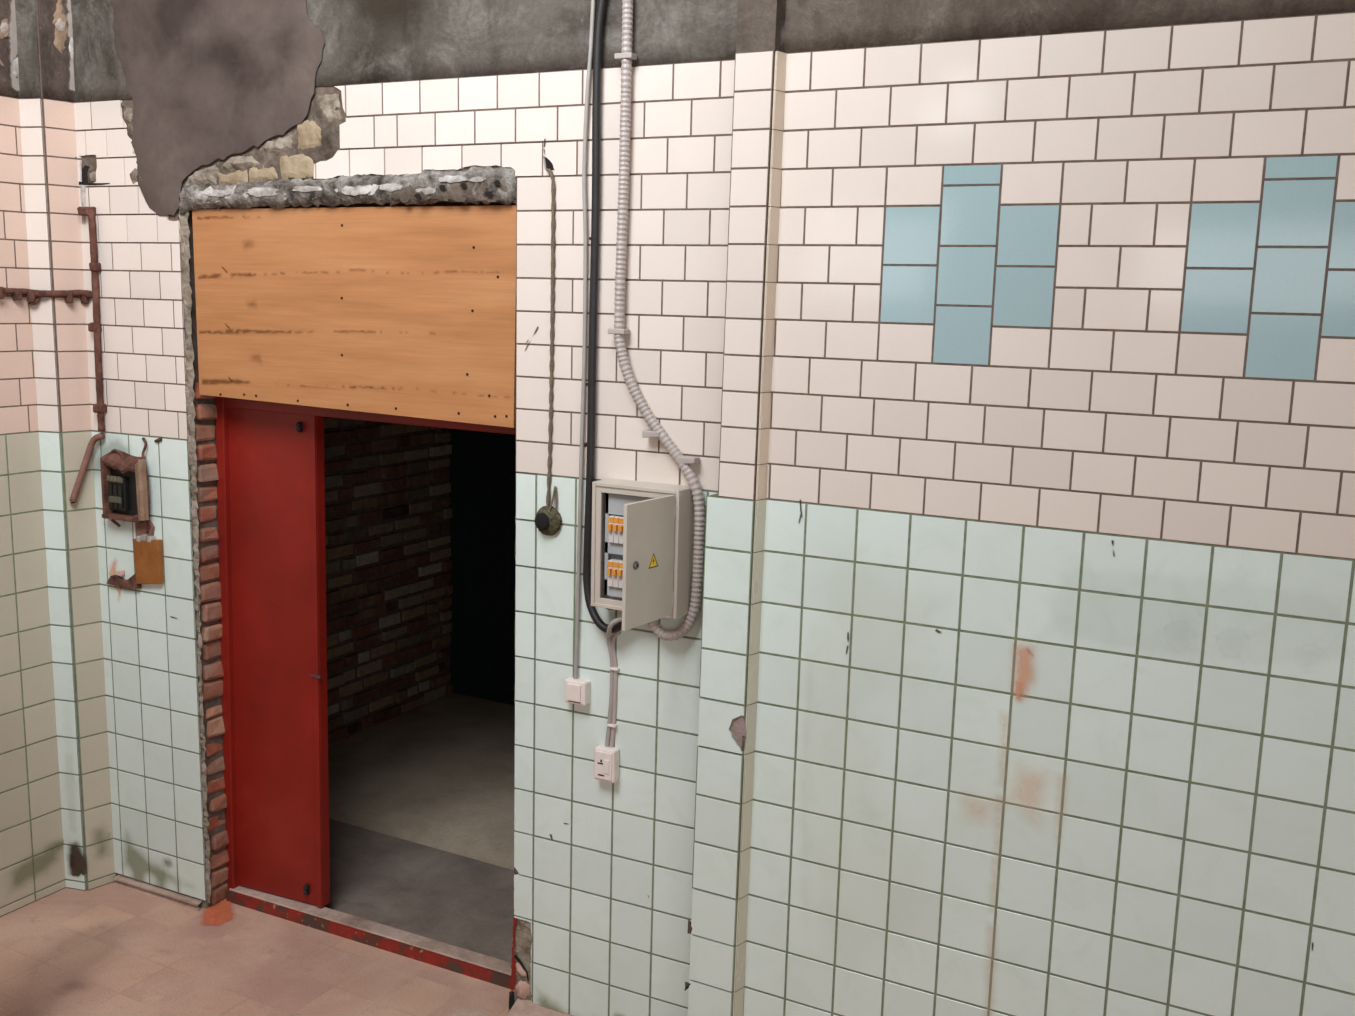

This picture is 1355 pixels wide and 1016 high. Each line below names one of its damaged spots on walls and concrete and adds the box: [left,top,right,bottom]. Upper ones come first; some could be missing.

flaking render [0,0,20,91]
peeling [52,0,75,91]
spalling [185,92,508,203]
spalling [178,211,211,903]
spalling [730,716,746,751]
spalling [511,916,532,1000]